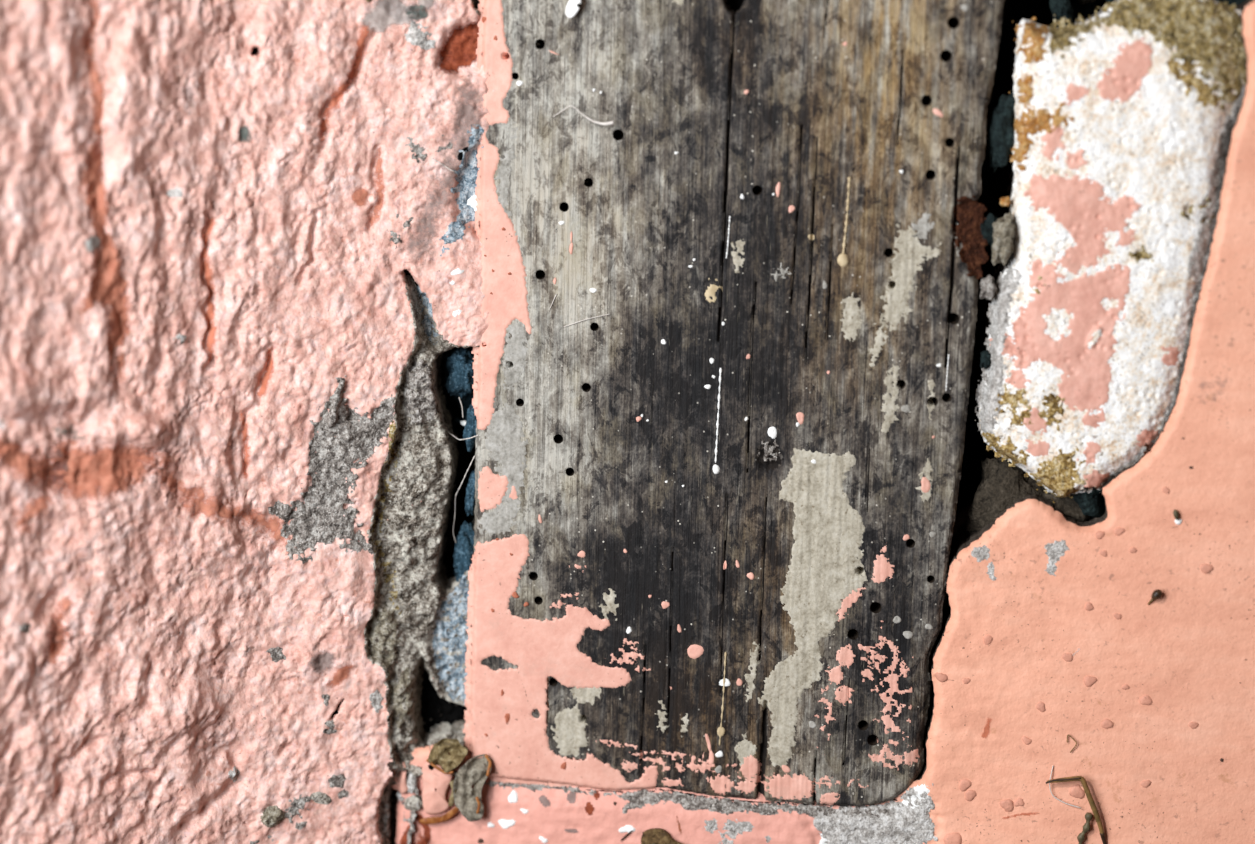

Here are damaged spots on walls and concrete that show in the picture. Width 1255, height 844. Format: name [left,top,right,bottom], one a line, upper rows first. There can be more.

spalling [266,0,938,844]
spalling [975,0,1246,518]